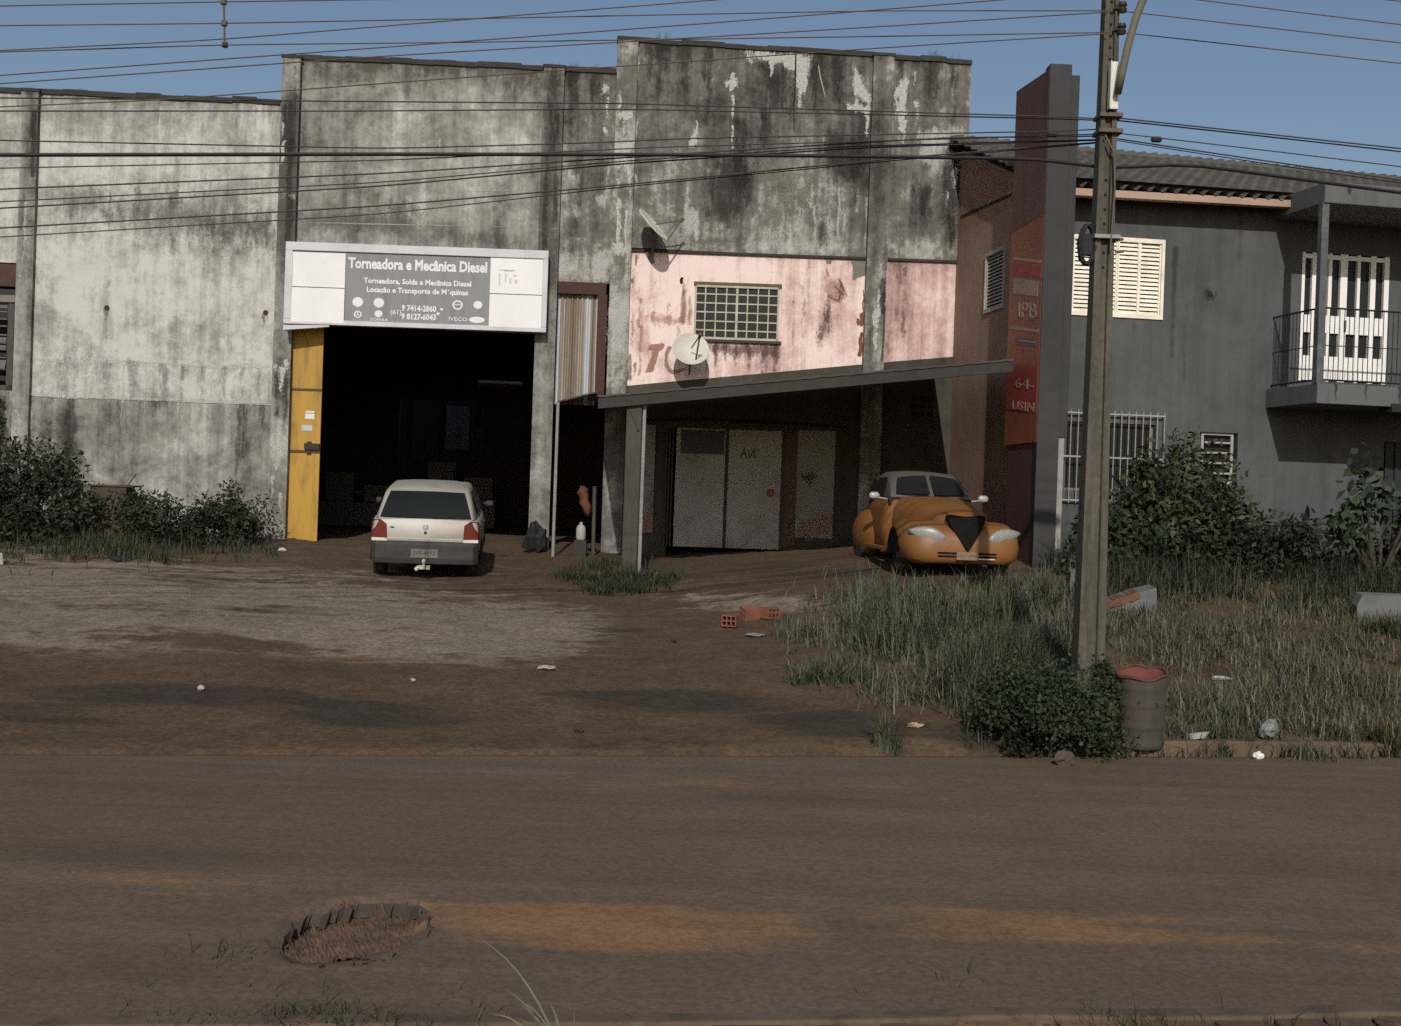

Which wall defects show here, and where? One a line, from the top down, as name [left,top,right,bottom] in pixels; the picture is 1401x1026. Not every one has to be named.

damp [2,112,37,176]
damp [284,95,296,238]
damp [637,37,752,241]
peeling [746,50,813,108]
damp [770,130,867,254]
damp [810,54,843,106]
peeling [847,68,872,134]
damp [894,54,962,246]
damp [30,346,288,457]